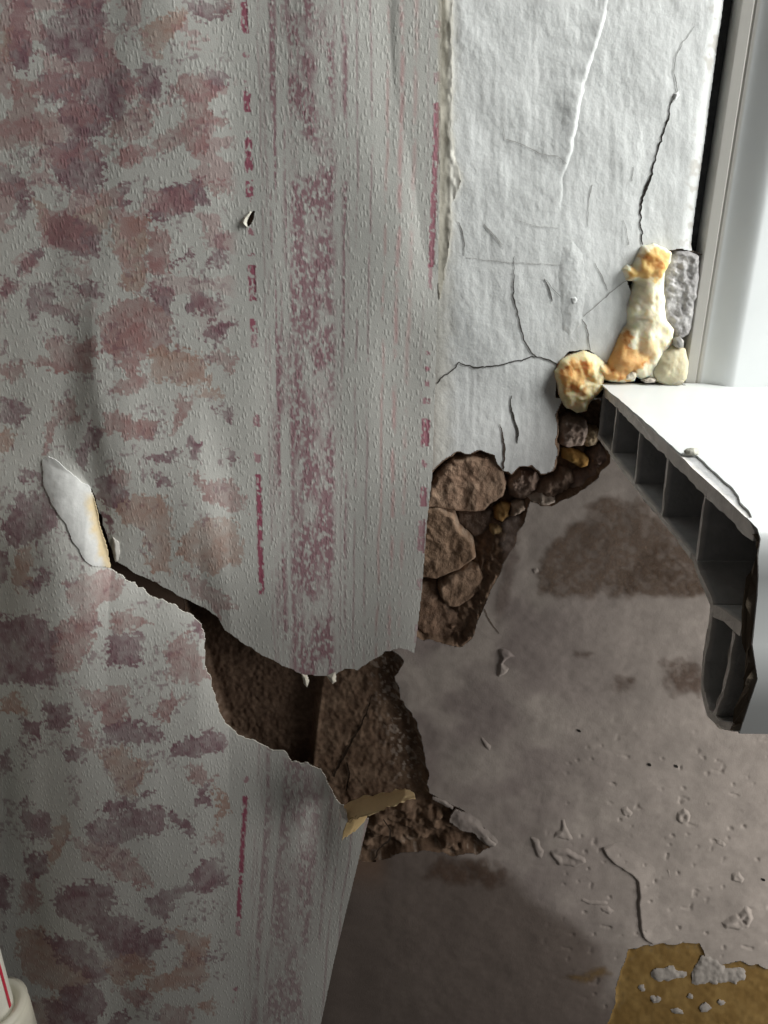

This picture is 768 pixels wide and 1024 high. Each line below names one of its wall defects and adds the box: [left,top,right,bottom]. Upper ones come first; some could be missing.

crack [639,27,694,245]
crack [437,258,557,384]
crack [500,396,519,470]
spalling [417,377,657,647]
water stain [540,499,704,597]
spalling [497,648,515,677]
spalling [184,598,498,862]
spalling [530,819,586,867]
peeling [602,842,768,1024]